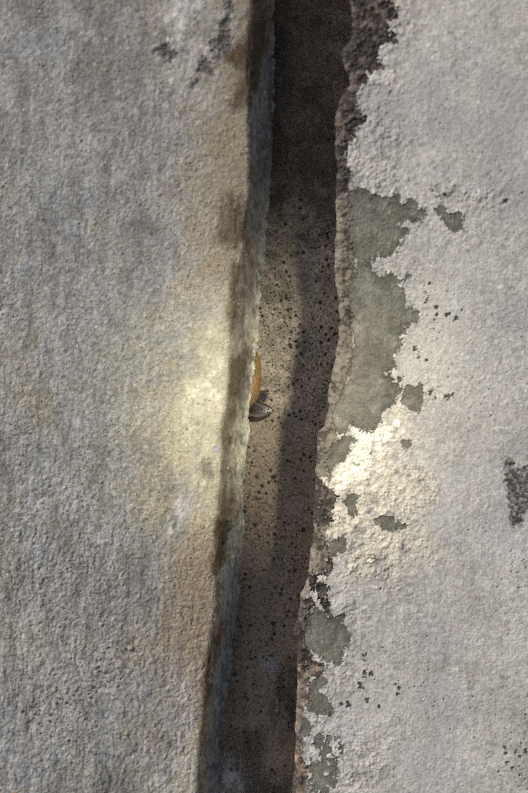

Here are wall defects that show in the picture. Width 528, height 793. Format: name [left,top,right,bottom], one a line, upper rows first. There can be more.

corrosion [224,0,268,107]
corrosion [228,262,239,332]
corrosion [219,348,249,452]
peeling [292,0,465,793]
corrosion [212,471,231,573]
corrosion [199,634,220,739]